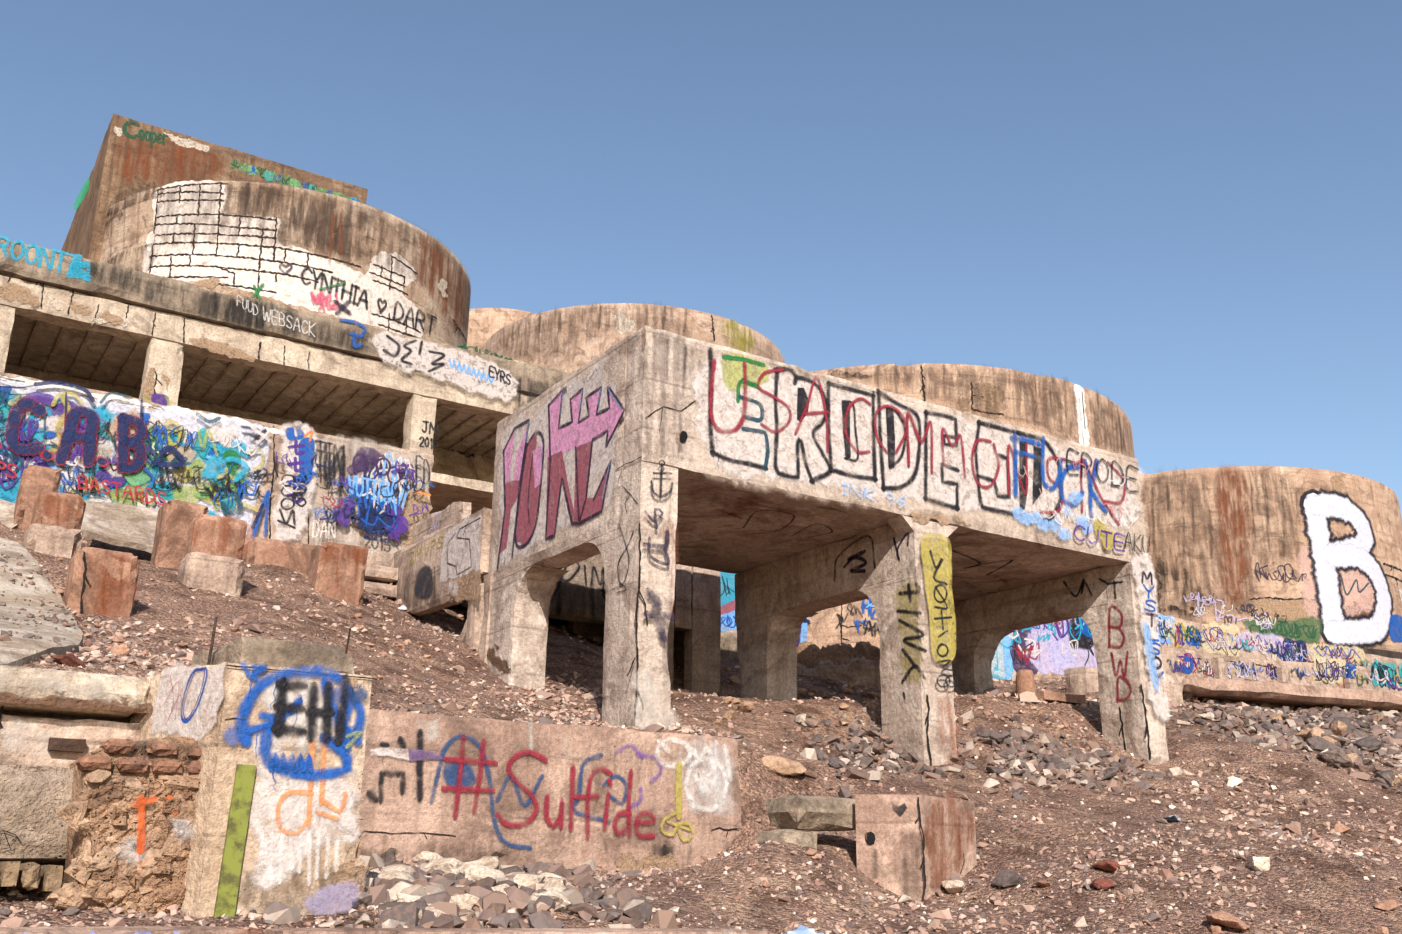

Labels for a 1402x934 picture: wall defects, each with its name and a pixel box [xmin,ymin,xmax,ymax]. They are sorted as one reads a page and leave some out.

crack [924,694,932,766]
spalling [86,779,194,913]
crack [915,797,926,900]